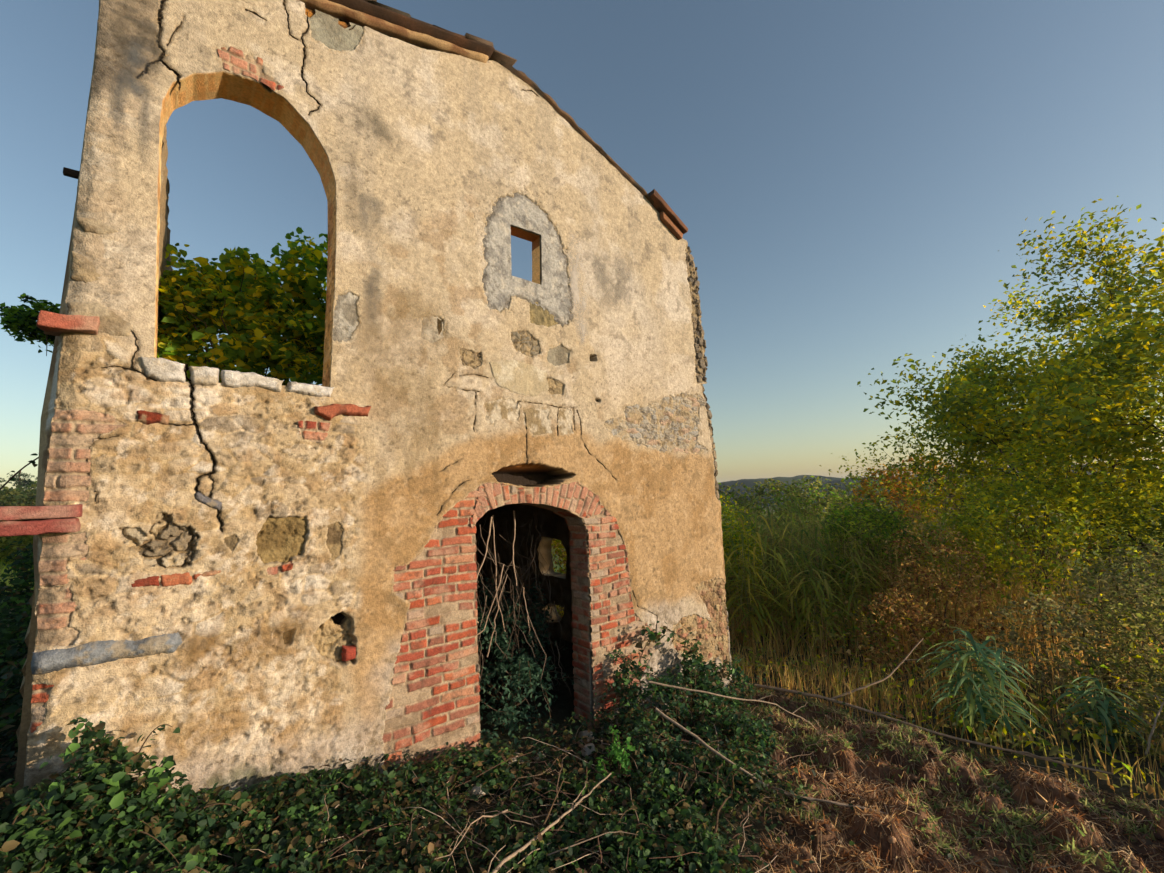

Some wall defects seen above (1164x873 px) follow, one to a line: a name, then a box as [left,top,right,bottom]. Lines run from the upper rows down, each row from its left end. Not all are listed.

crack [137,0,182,90]
flaking render [218,46,284,91]
crack [245,0,321,115]
flaking render [332,292,359,342]
crack [101,329,157,381]
flaking render [44,409,125,502]
crack [168,363,223,531]
spalling [123,513,199,569]
spalling [224,535,239,551]
spalling [256,516,308,575]
spalling [312,612,353,661]